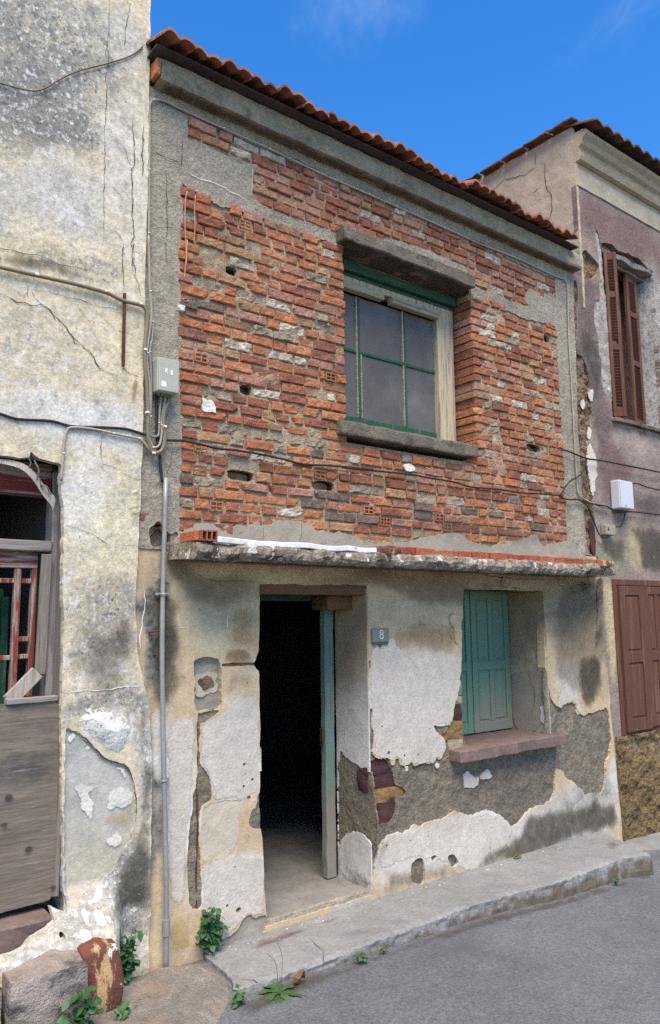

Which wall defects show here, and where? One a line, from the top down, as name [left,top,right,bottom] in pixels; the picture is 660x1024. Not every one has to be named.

crack [0,1,253,376]
crack [494,155,552,216]
flaking render [574,231,612,555]
flaking render [449,614,462,644]
damp [580,659,600,703]
flaking render [337,667,611,870]
flaking render [63,728,135,943]
damp [486,802,617,862]
damp [119,841,149,905]
flaking render [411,855,435,884]